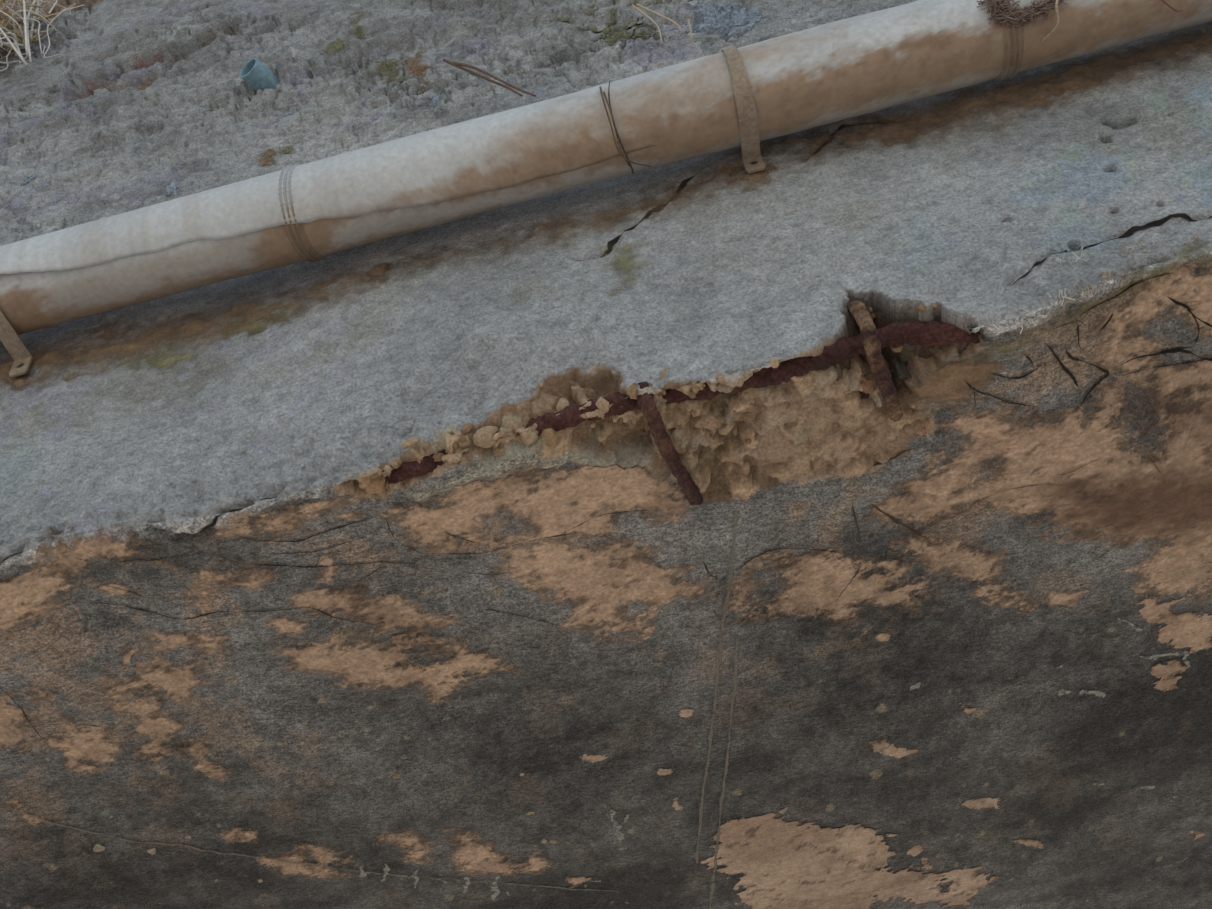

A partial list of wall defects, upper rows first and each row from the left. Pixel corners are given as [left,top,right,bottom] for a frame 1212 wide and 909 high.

crack [576,165,711,261]
crack [1012,213,1212,285]
crack [964,271,1212,408]
rust [915,358,1001,405]
spalling [203,261,1212,704]
crack [974,458,1101,504]
leakage [1063,469,1212,535]
peeling [0,527,176,643]
efflorescence [1140,651,1190,666]
peeling [0,625,238,781]
peeling [579,754,608,763]
peeling [869,739,919,758]